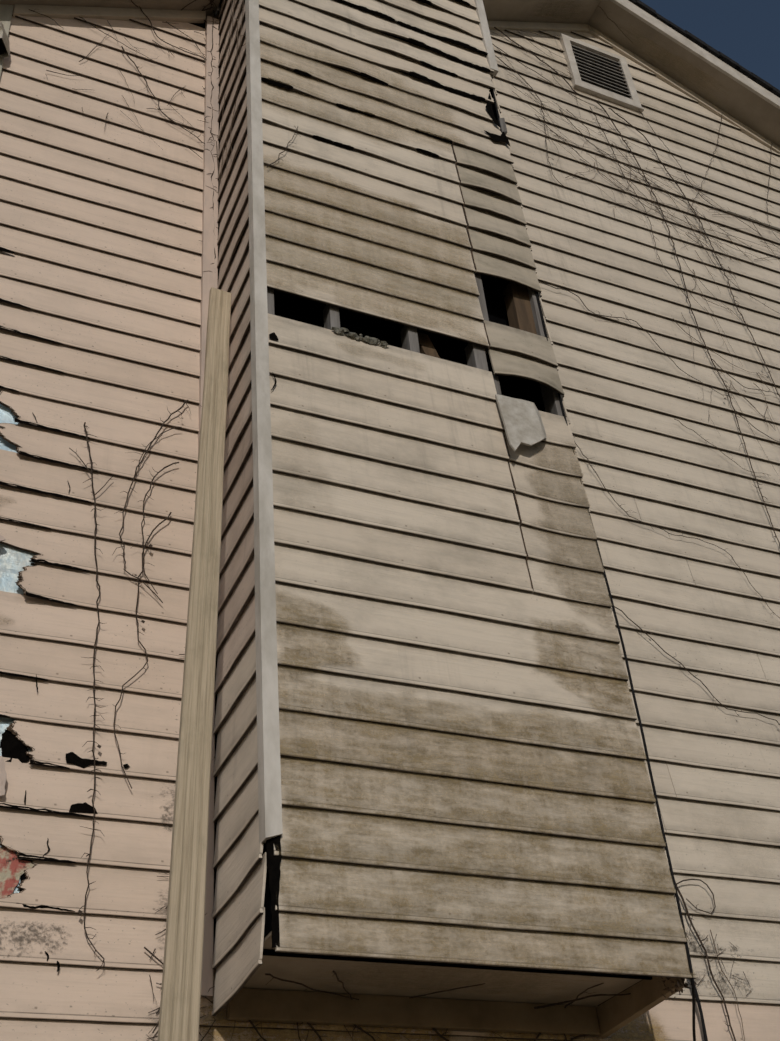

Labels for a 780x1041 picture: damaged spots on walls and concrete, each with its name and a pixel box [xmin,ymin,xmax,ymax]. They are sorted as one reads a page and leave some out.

water stain [278,596,351,675]
water stain [540,623,632,719]
peeling [0,847,34,898]
water stain [278,691,752,994]